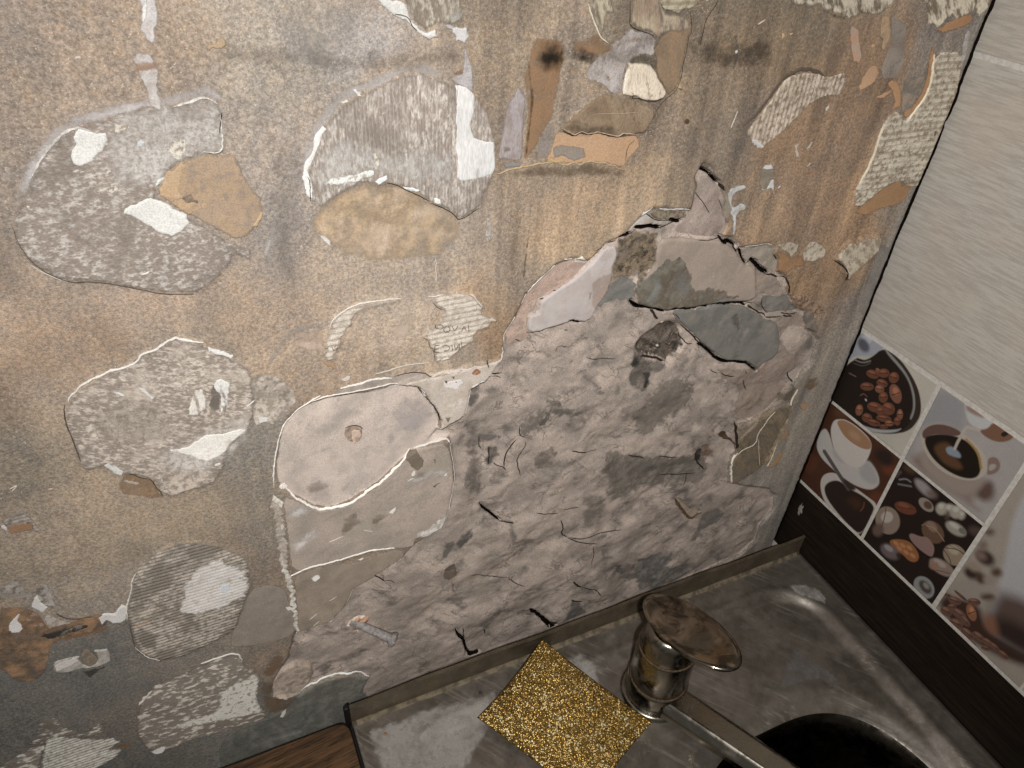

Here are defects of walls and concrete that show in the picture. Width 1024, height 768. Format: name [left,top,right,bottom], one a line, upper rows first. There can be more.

peeling [548,17,692,166]
peeling [71,123,130,174]
peeling [124,177,189,236]
peeling [189,379,230,416]
peeling [160,429,247,495]
crack [478,427,526,473]
spalling [264,164,881,718]
crack [732,421,740,449]
crack [479,502,514,524]
crack [537,507,618,602]
crack [471,574,557,628]
crack [455,628,486,656]